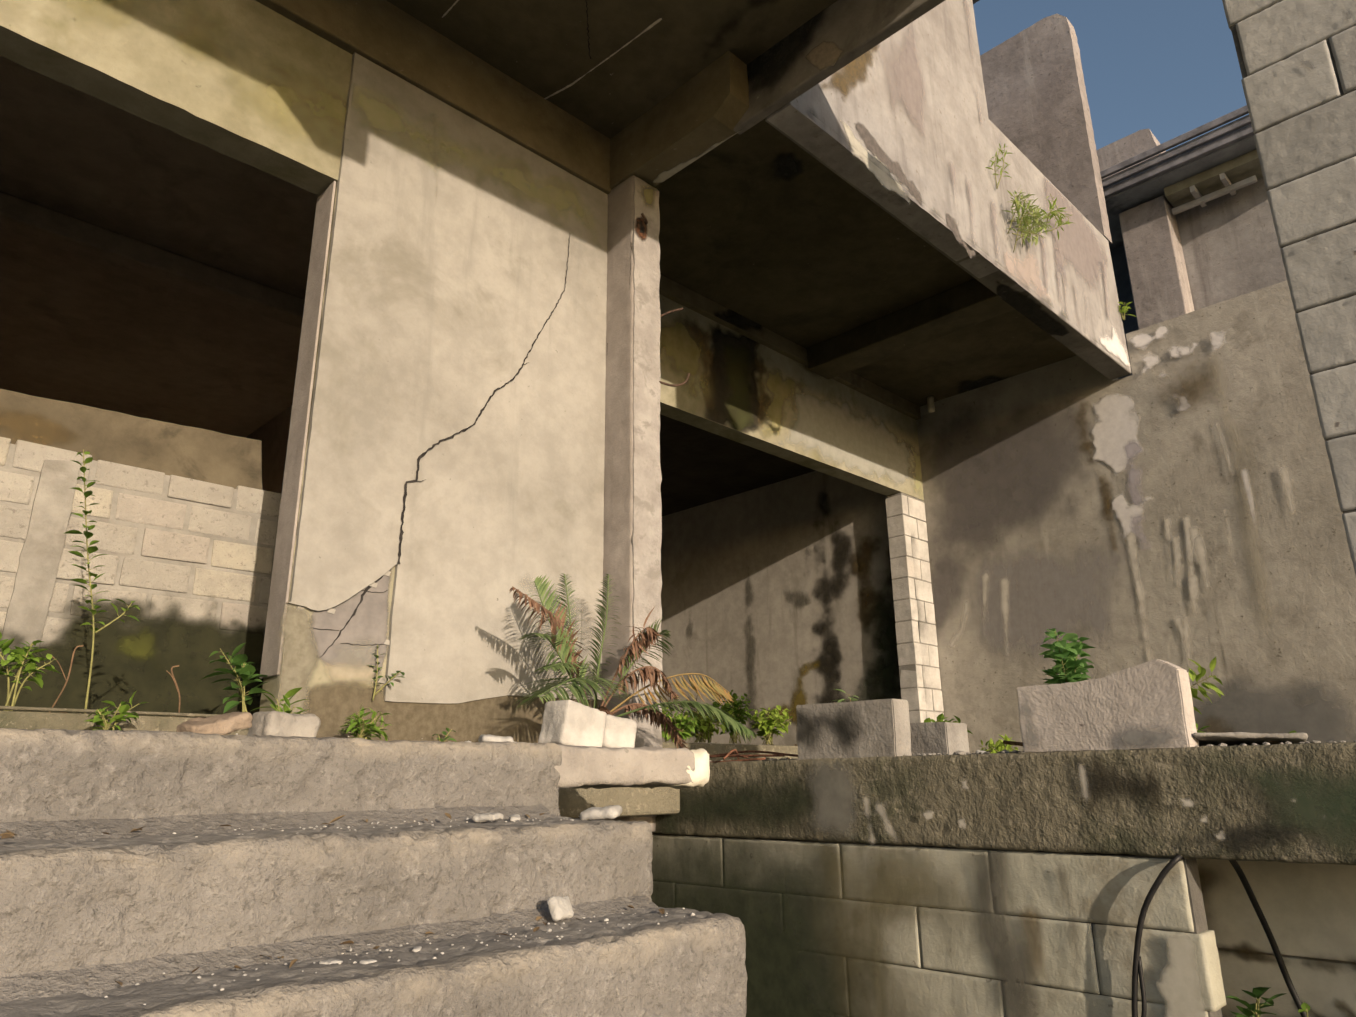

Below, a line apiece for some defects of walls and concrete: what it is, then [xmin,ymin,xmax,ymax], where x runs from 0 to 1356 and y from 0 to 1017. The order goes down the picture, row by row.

spalling [843,122,922,205]
spalling [946,214,976,258]
crack [397,237,570,564]
leakage [684,310,771,433]
leakage [790,393,1093,542]
spalling [1092,394,1151,615]
spalling [296,569,391,684]
leakage [788,532,901,704]
leakage [917,554,1106,651]
leakage [656,763,893,834]
leakage [1080,759,1159,806]
leakage [979,852,1041,1017]